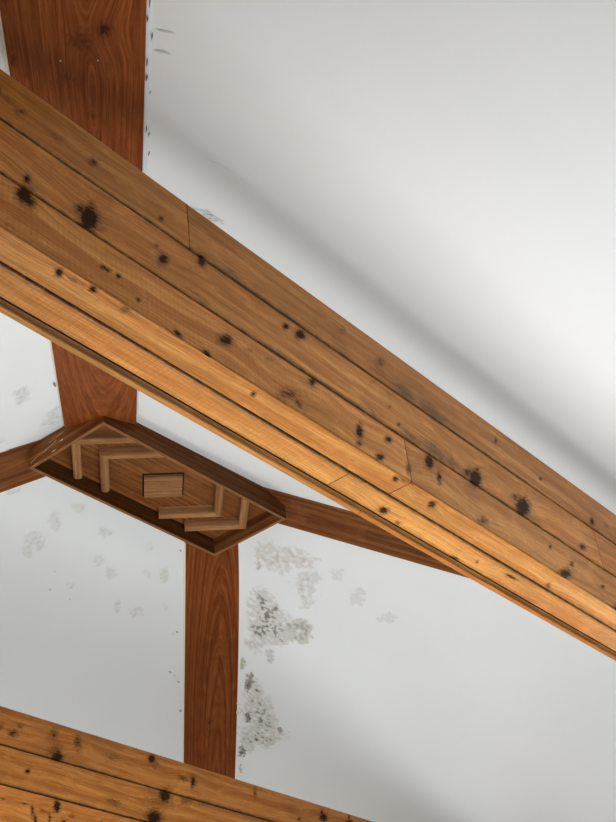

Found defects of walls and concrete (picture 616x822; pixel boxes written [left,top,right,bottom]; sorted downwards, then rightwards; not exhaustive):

mould [244,538,348,664]
mould [236,657,291,773]